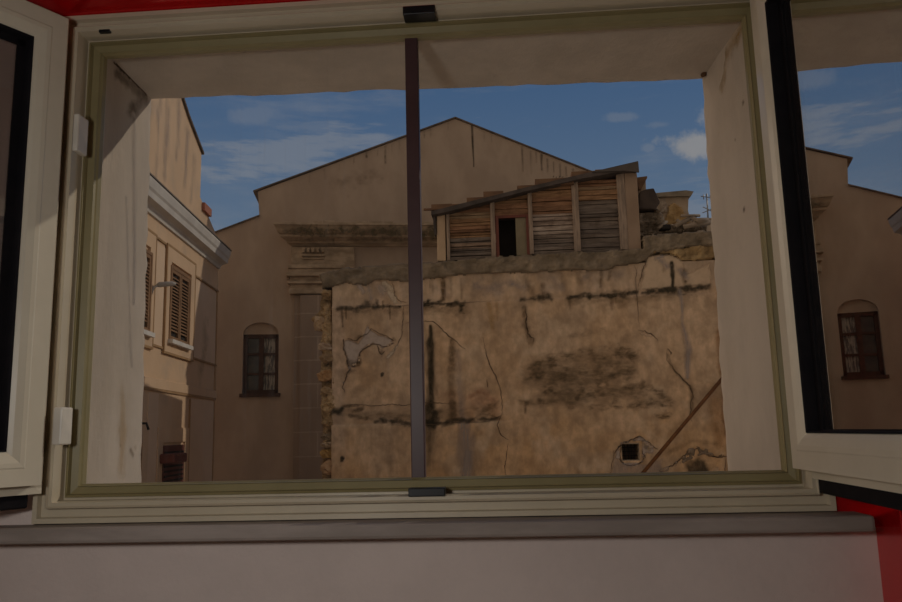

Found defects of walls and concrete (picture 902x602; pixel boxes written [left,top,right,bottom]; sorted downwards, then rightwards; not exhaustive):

damp [336,301,406,320]
damp [567,261,710,313]
peeling [342,327,394,392]
damp [332,405,411,426]
crack [387,307,508,474]
damp [425,325,498,476]
crack [635,270,694,421]